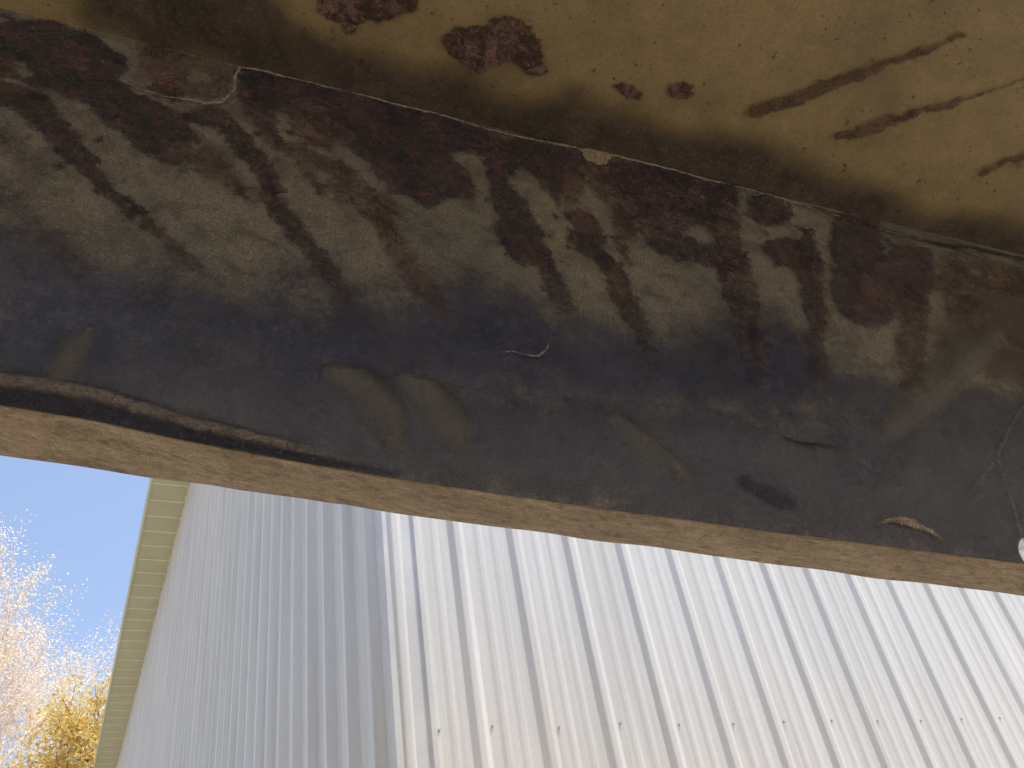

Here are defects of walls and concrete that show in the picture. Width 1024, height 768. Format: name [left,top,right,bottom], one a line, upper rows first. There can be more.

corrosion [0,78,202,269]
corrosion [180,105,350,295]
corrosion [316,0,419,35]
corrosion [441,15,549,77]
corrosion [486,171,652,344]
crack [122,66,1024,259]
corrosion [667,81,694,100]
corrosion [762,225,829,375]
corrosion [744,33,967,117]
corrosion [833,79,1024,140]
damp [0,231,1024,562]
peeling [880,517,942,539]